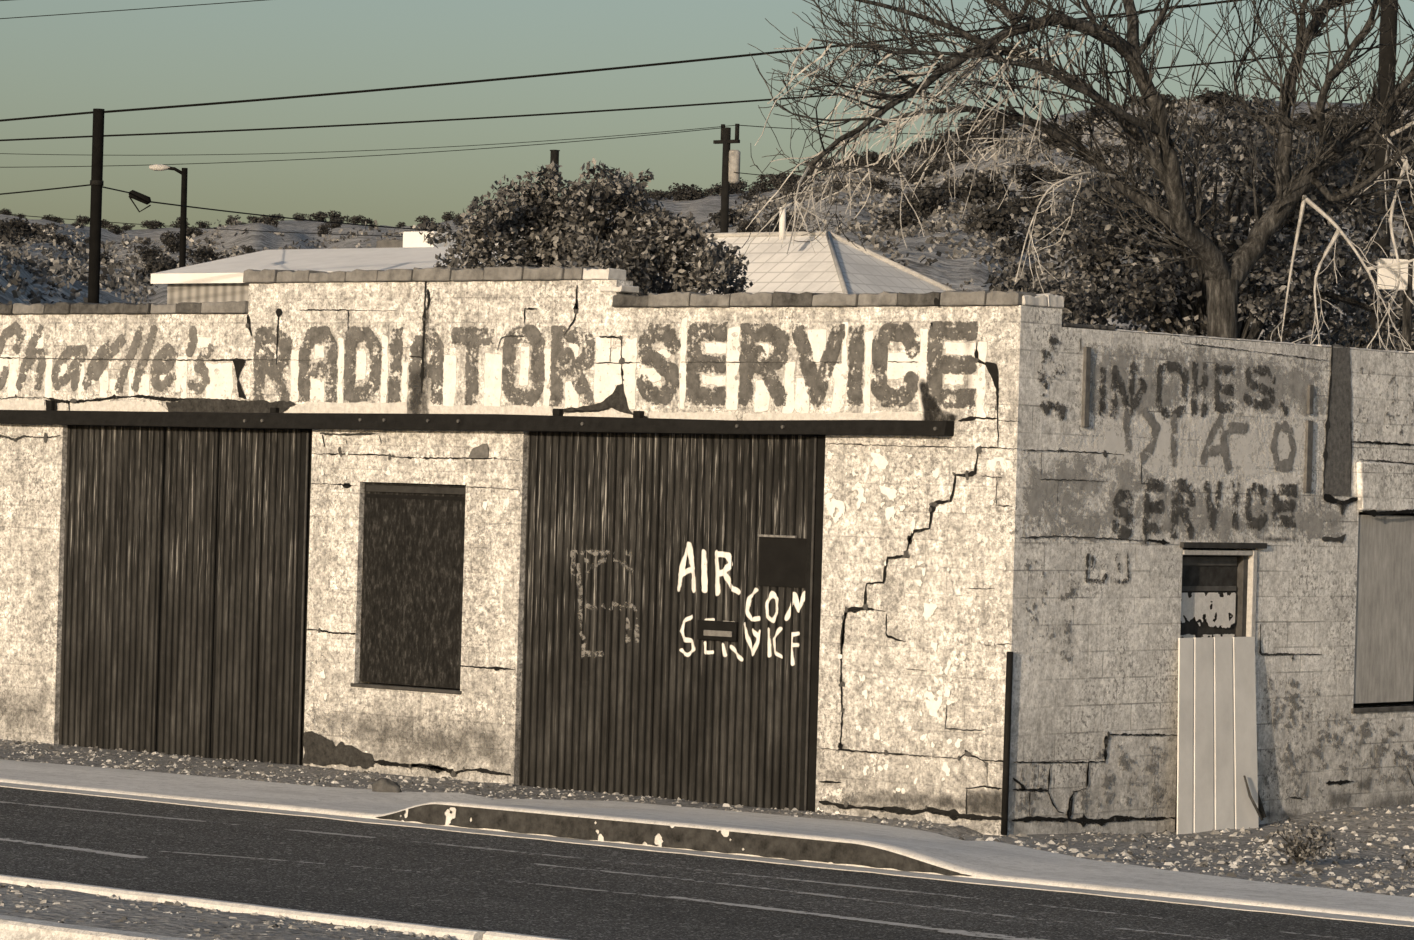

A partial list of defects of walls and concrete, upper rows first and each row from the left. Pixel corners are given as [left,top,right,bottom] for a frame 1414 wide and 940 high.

crack [688,358,839,366]
crack [819,343,1177,827]
peeling [1180,592,1236,638]
peeling [1081,737,1173,816]
peeling [1260,668,1414,810]